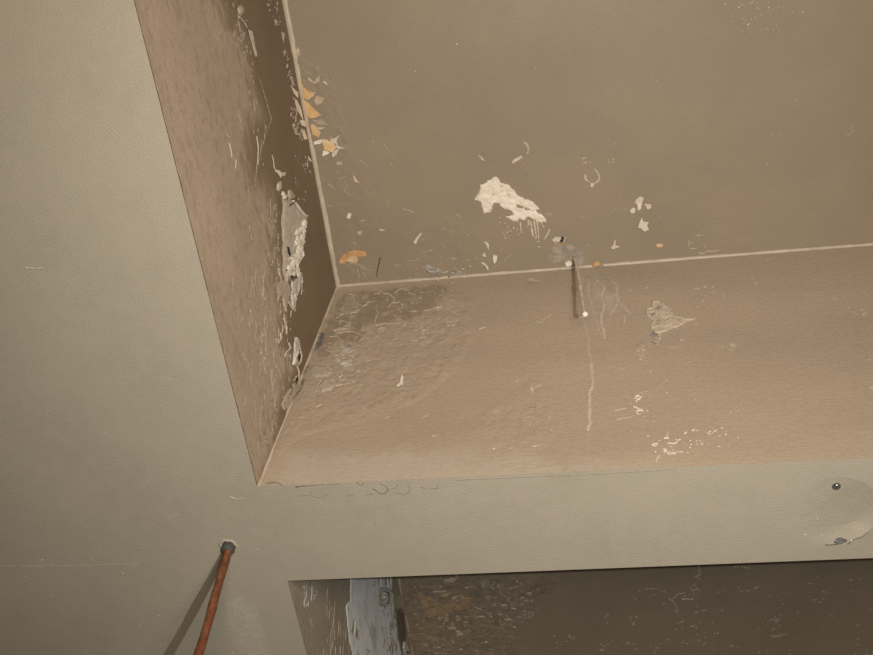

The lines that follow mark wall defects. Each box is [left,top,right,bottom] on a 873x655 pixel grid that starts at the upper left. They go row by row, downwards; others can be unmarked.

peeling [135,0,555,486]
peeling [612,196,651,232]
flaking render [618,300,697,372]
peeling [614,380,668,424]
peeling [646,427,739,462]
peeling [300,570,576,655]